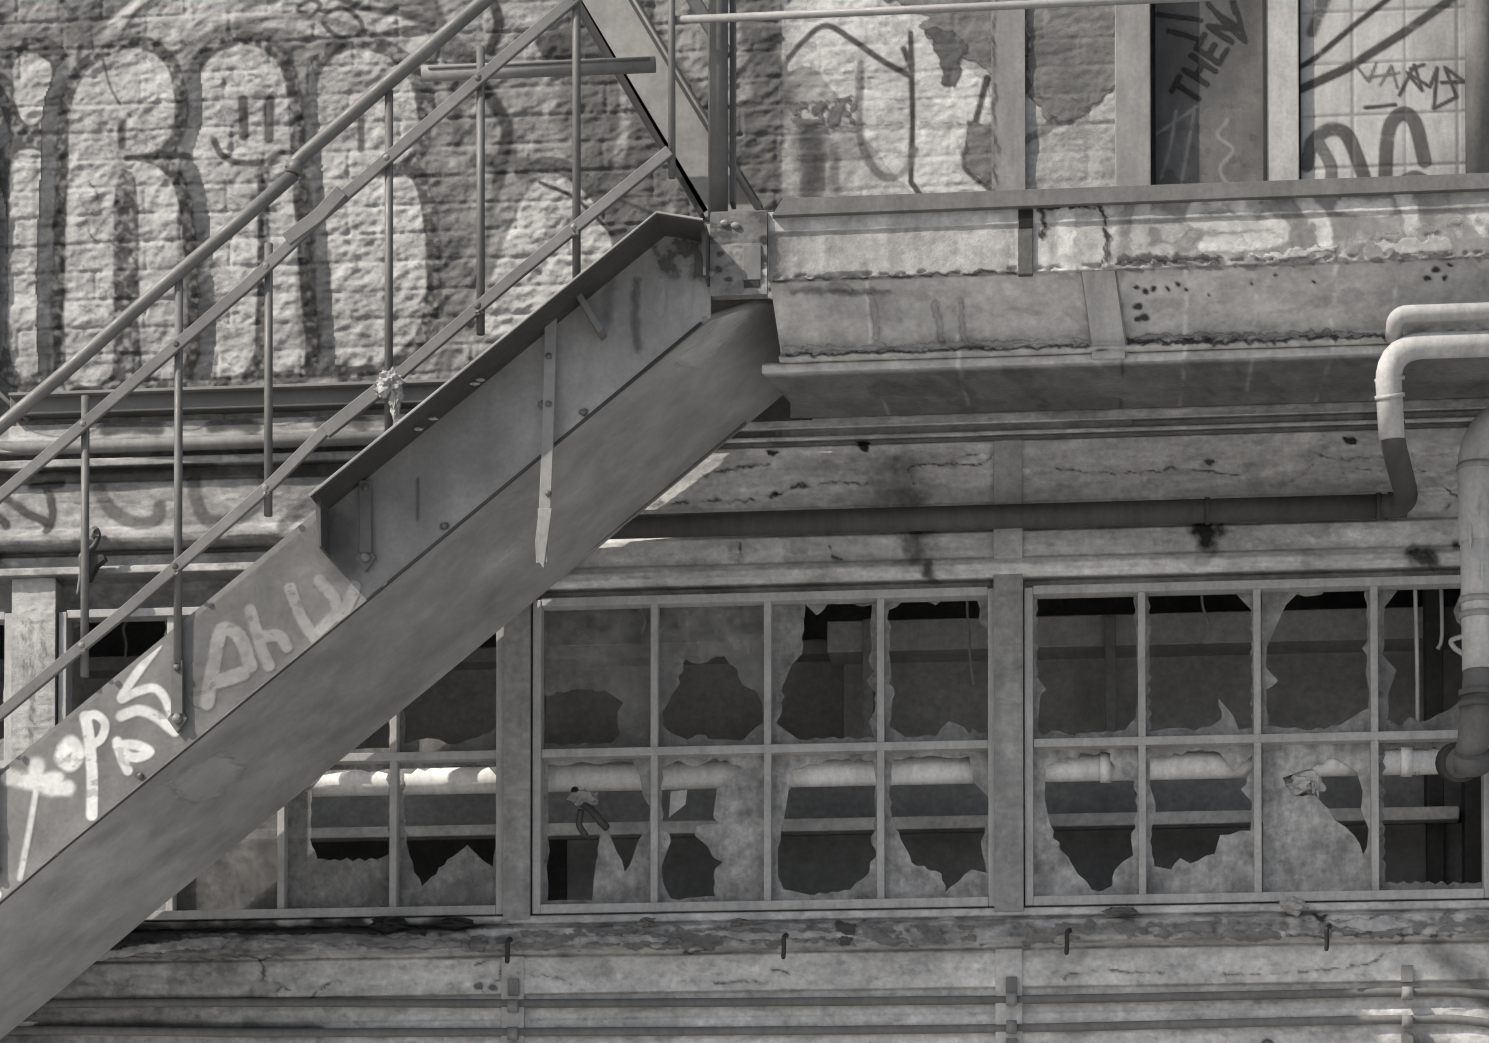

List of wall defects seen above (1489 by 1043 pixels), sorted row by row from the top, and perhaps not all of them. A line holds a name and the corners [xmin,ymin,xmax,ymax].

crack [1037,206,1111,266]
peeling [97,920,984,961]
peeling [1022,912,1489,947]